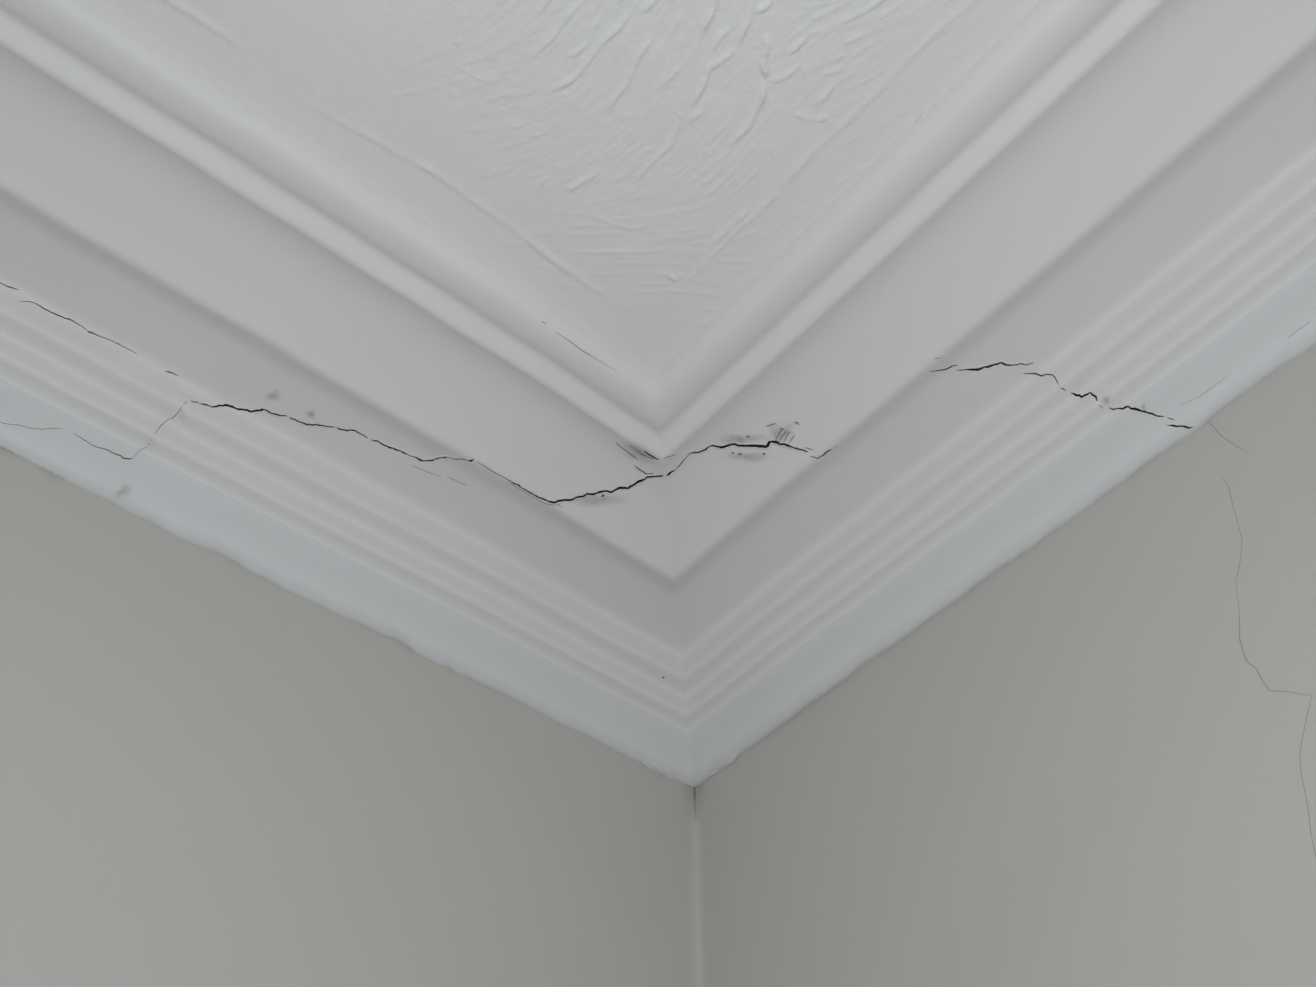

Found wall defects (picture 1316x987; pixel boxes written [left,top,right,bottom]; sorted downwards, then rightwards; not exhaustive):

crack [0,282,137,354]
crack [1,371,837,508]
crack [930,358,1244,450]
crack [1223,479,1316,857]